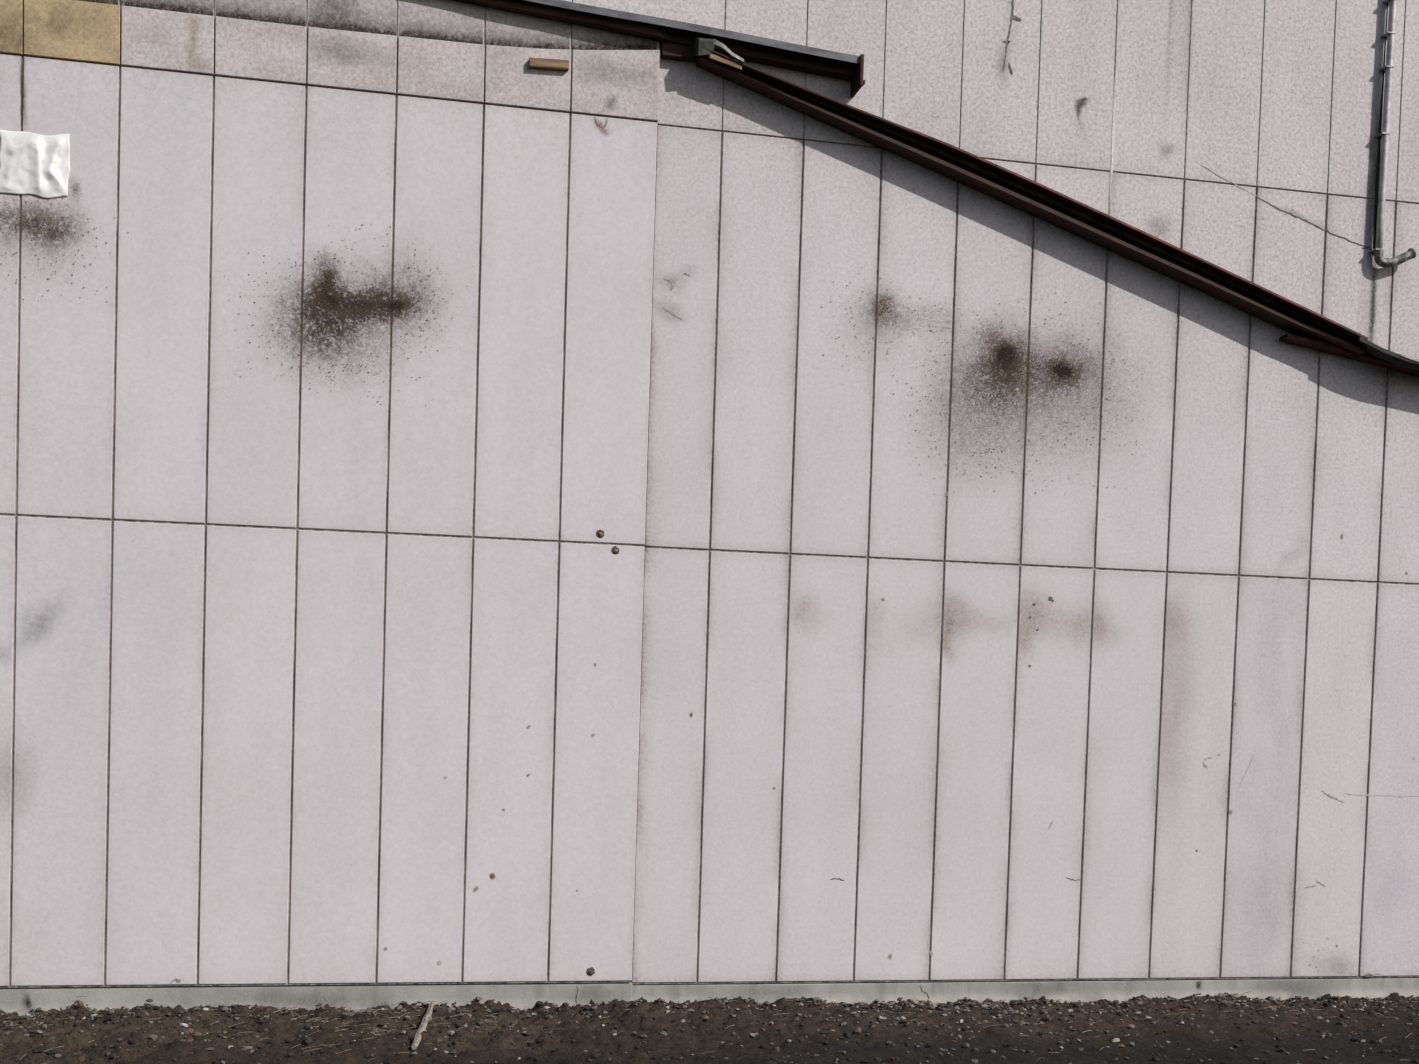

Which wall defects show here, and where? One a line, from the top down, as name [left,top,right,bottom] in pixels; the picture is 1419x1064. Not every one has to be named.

crack [1003,0,1022,74]